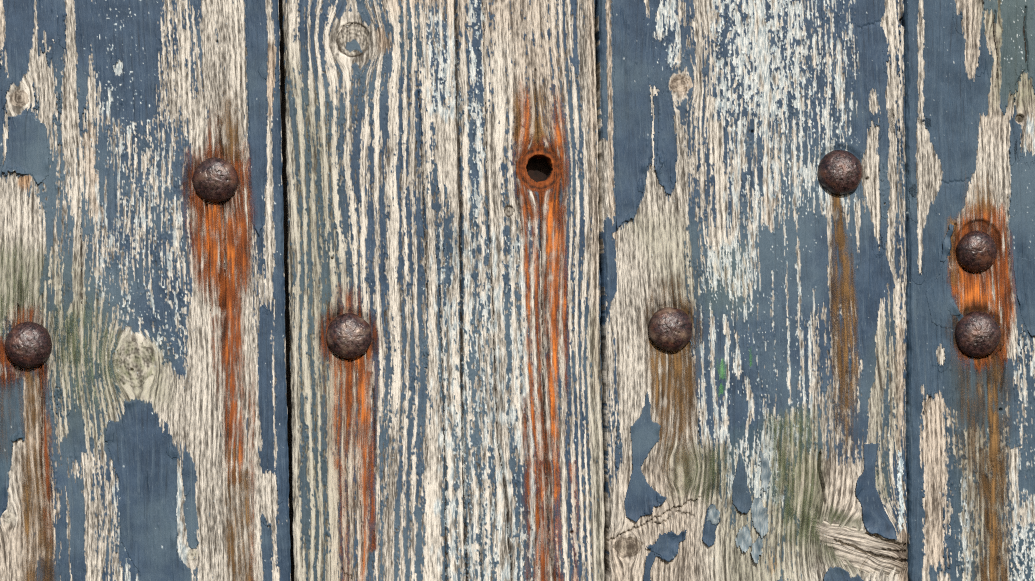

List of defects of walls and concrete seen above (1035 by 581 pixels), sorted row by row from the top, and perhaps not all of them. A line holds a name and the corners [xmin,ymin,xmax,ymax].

corrosion [0,309,52,581]
peeling [0,0,87,417]
peeling [105,400,204,581]
corrosion [184,111,252,581]
peeling [245,0,280,314]
corrosion [320,294,377,571]
corrosion [514,95,568,581]
peeling [610,0,703,523]
corrosion [647,281,693,444]
peeling [917,388,955,575]
peeling [862,0,1035,360]
corrosion [950,188,1014,581]